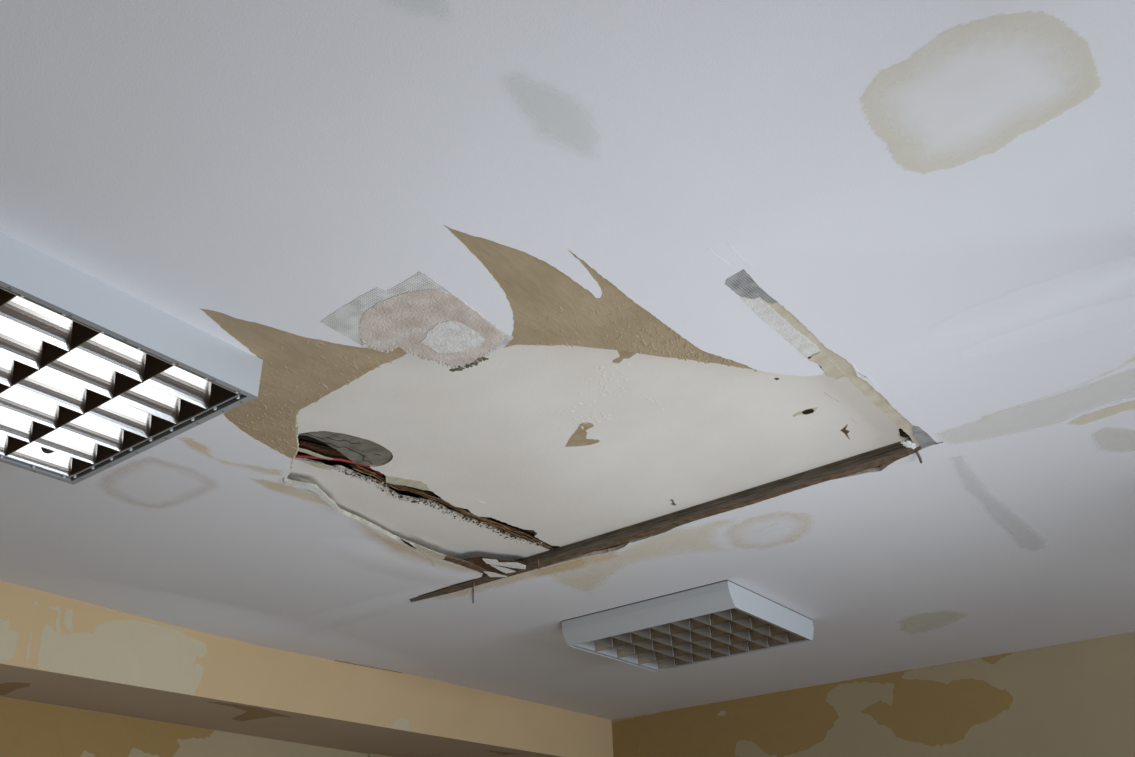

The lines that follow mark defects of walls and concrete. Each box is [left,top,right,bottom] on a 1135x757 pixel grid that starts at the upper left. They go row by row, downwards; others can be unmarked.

peeling [446,226,757,372]
peeling [201,309,407,459]
crack [295,431,559,550]
flaking render [482,558,526,577]